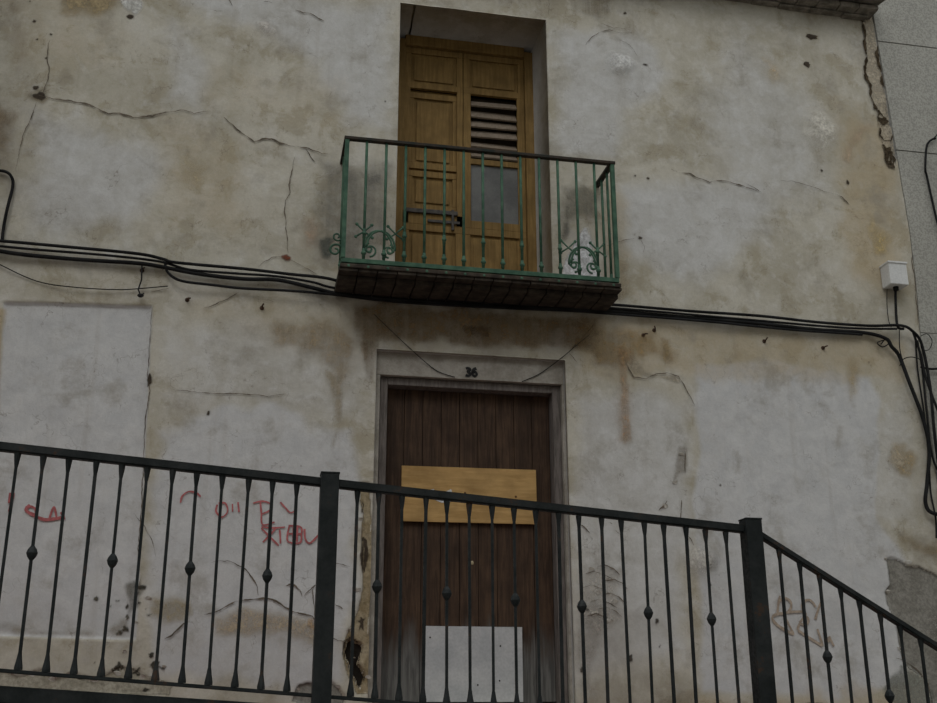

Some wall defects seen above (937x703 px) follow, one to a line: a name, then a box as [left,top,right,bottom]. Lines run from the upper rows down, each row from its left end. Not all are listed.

peeling [862,18,896,168]
crack [15,43,325,274]
peeling [110,582,152,635]
crack [208,560,343,619]
spalling [343,492,372,694]
spalling [884,557,937,703]
spalling [0,653,172,695]
spalling [292,683,312,703]
spalling [331,684,344,703]